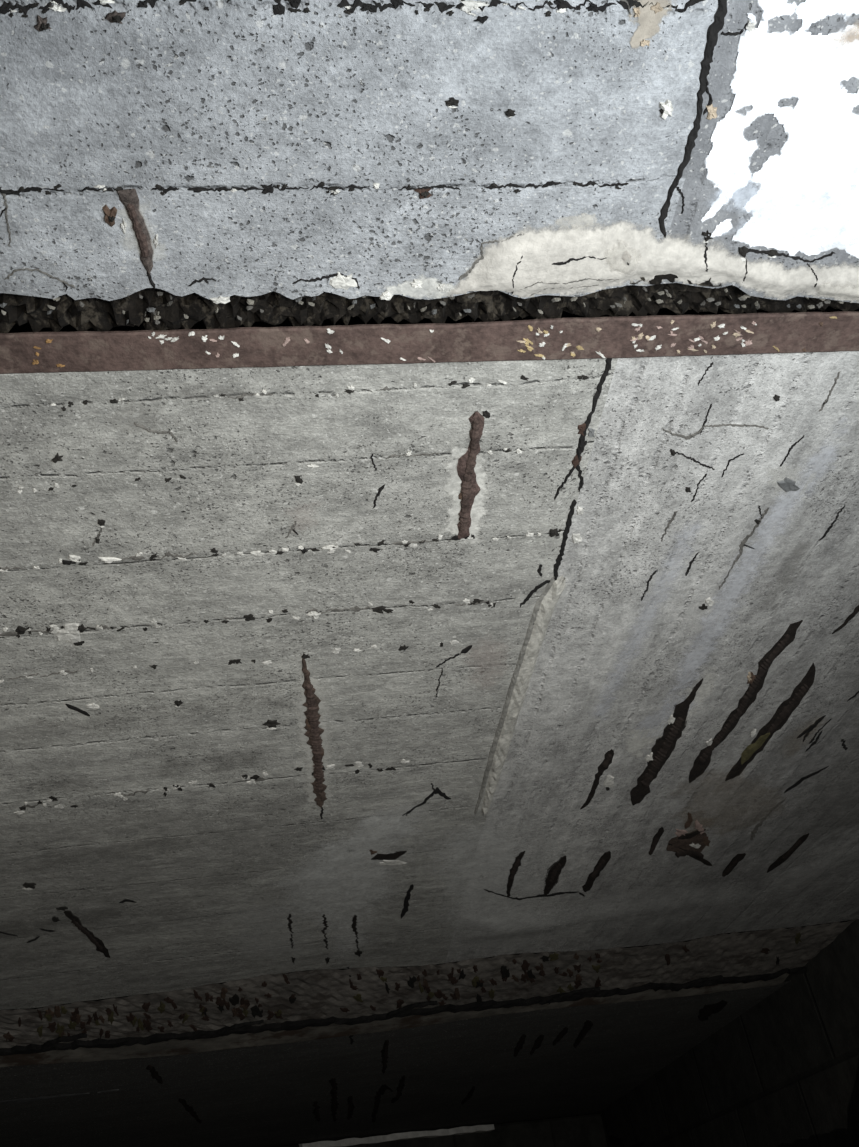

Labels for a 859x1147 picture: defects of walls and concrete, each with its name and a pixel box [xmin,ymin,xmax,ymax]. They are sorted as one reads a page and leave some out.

spalling [0,1,67,32]
spalling [100,0,148,24]
peeling [273,0,311,15]
peeling [343,0,430,15]
peeling [446,0,489,24]
peeling [544,0,568,17]
crack [658,0,757,238]
peeling [701,0,859,262]
spalling [0,183,859,365]
crack [520,358,612,625]
spalling [580,676,714,809]
spalling [689,620,815,783]